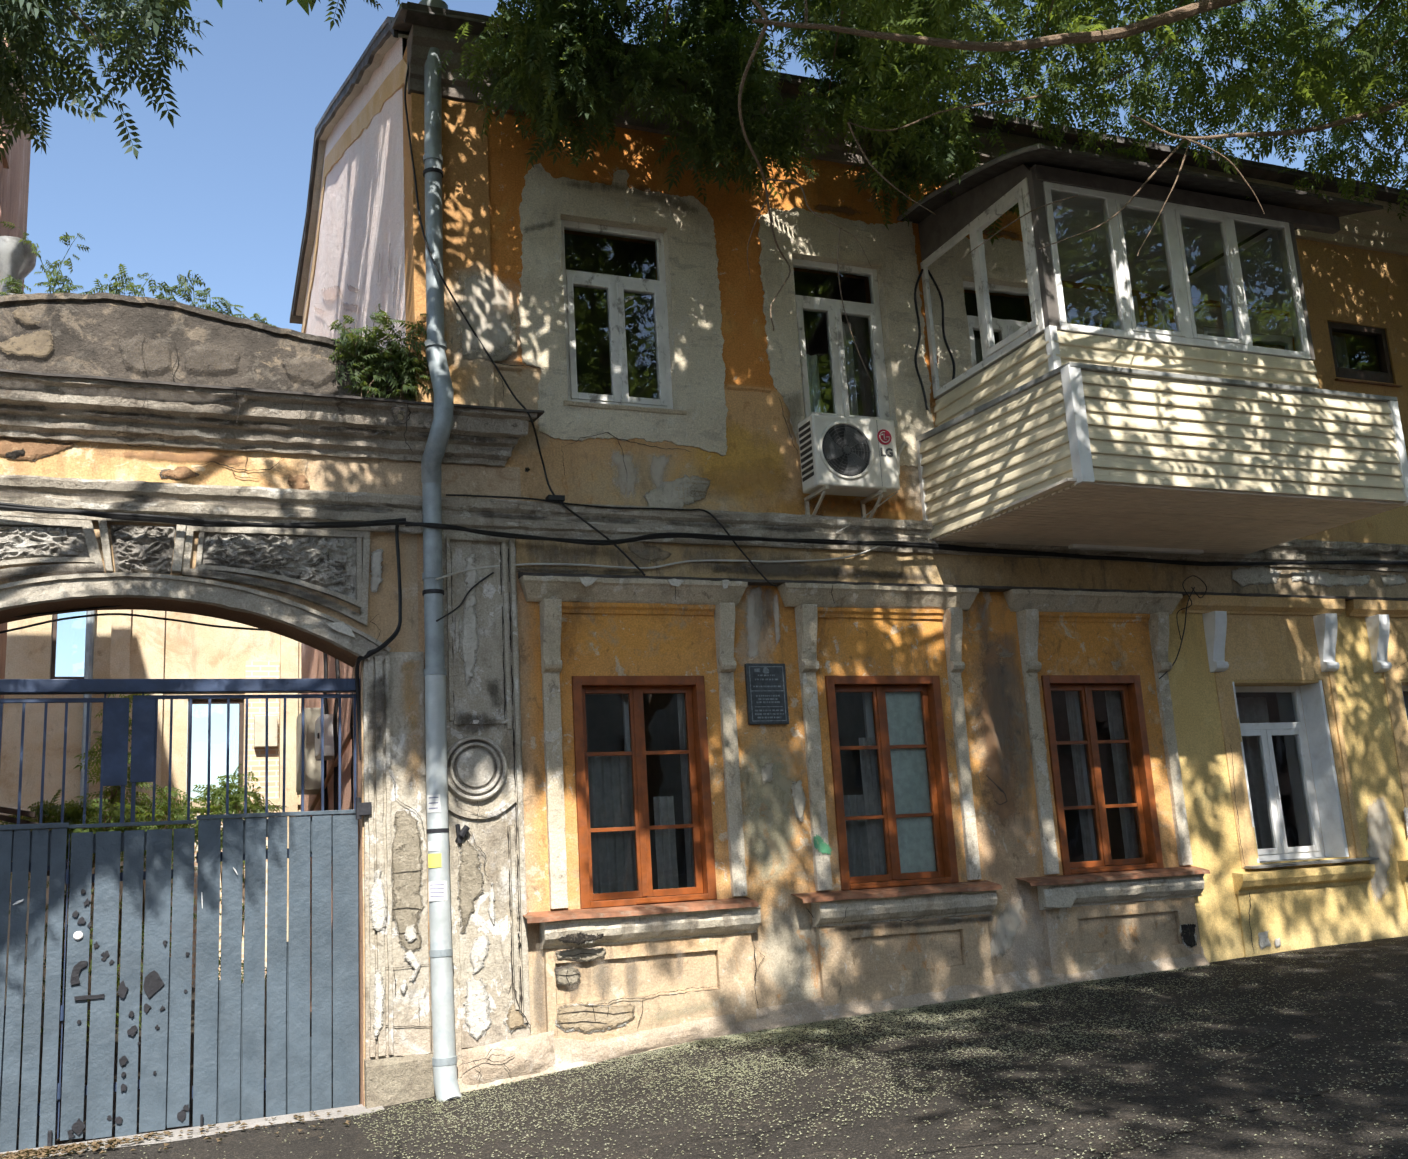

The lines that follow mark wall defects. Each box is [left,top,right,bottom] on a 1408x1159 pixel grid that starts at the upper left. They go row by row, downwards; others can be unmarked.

spalling [0,308,54,358]
spalling [118,334,240,373]
peeling [451,328,518,362]
spalling [0,436,74,462]
spalling [159,466,200,480]
peeling [643,475,710,508]
peeling [1232,566,1406,587]
peeling [455,554,481,685]
water stain [978,642,1020,826]
peeling [791,780,806,822]
spalling [369,808,425,1039]
peeling [457,834,527,1040]